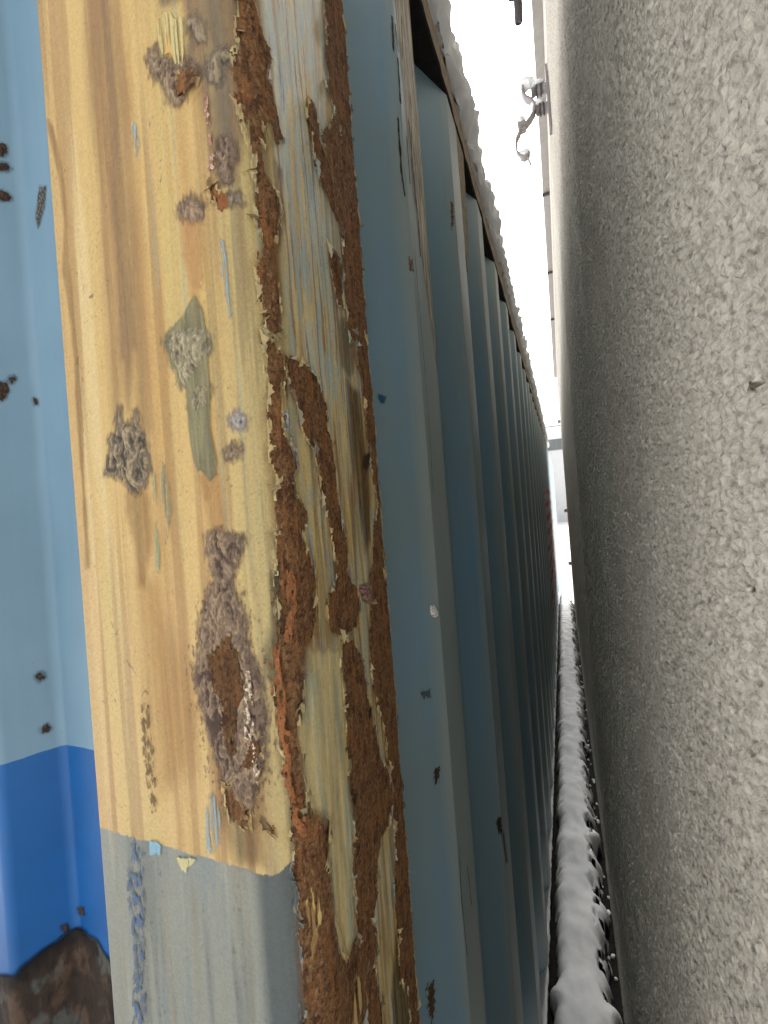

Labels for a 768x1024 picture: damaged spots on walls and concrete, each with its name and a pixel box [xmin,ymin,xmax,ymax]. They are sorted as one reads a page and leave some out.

water stain [186,0,241,149]
rust [0,143,9,171]
rust [36,187,46,227]
peeling [391,0,437,365]
rust [220,0,435,1024]
rust [0,925,115,1024]